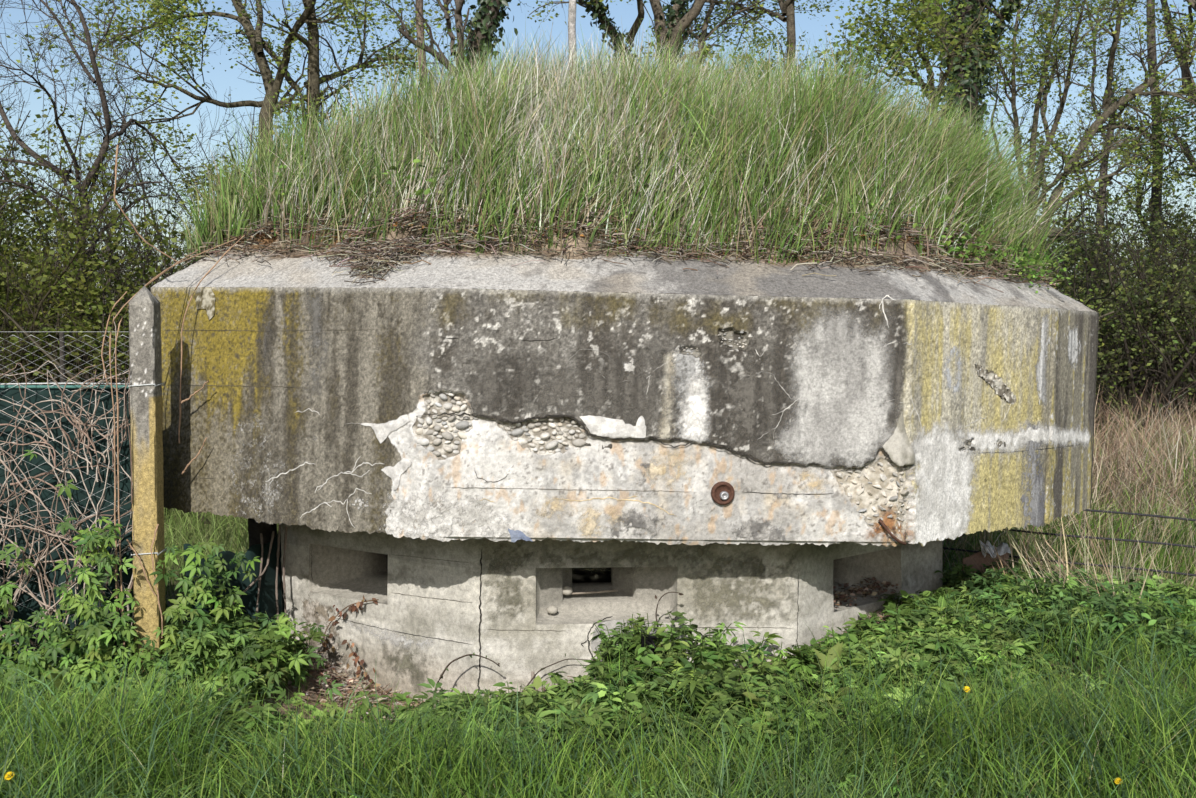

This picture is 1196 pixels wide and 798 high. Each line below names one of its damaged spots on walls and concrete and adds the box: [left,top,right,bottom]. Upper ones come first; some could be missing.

spalling [975,362,1017,404]
efflorescence [1035,314,1050,404]
efflorescence [1068,328,1081,369]
spalling [361,313,915,547]
crack [265,456,382,528]
corrosion [870,507,908,547]
crack [475,550,483,692]